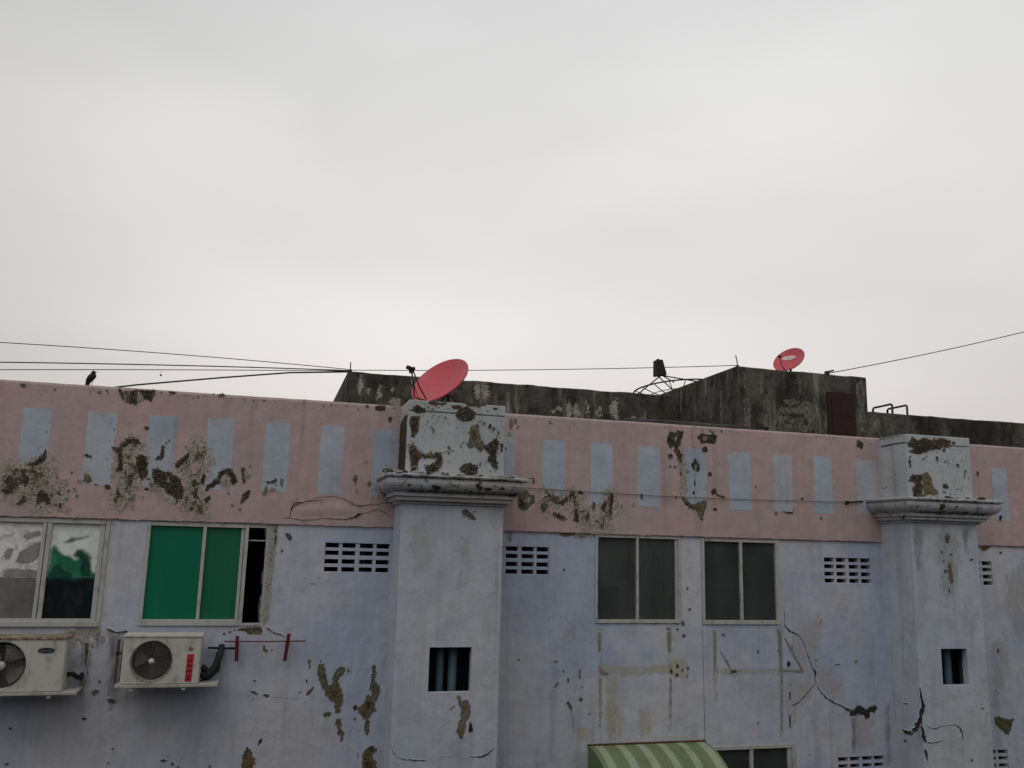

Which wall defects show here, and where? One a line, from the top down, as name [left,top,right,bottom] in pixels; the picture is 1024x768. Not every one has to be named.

spalling [118,388,155,406]
peeling [0,426,284,526]
crack [0,496,391,525]
spalling [356,374,519,492]
peeling [517,476,643,541]
peeling [667,430,725,521]
spalling [901,437,979,520]
peeling [222,524,292,653]
crack [504,499,876,740]
peeling [298,659,381,768]
peeling [449,695,473,739]
crack [901,686,964,762]